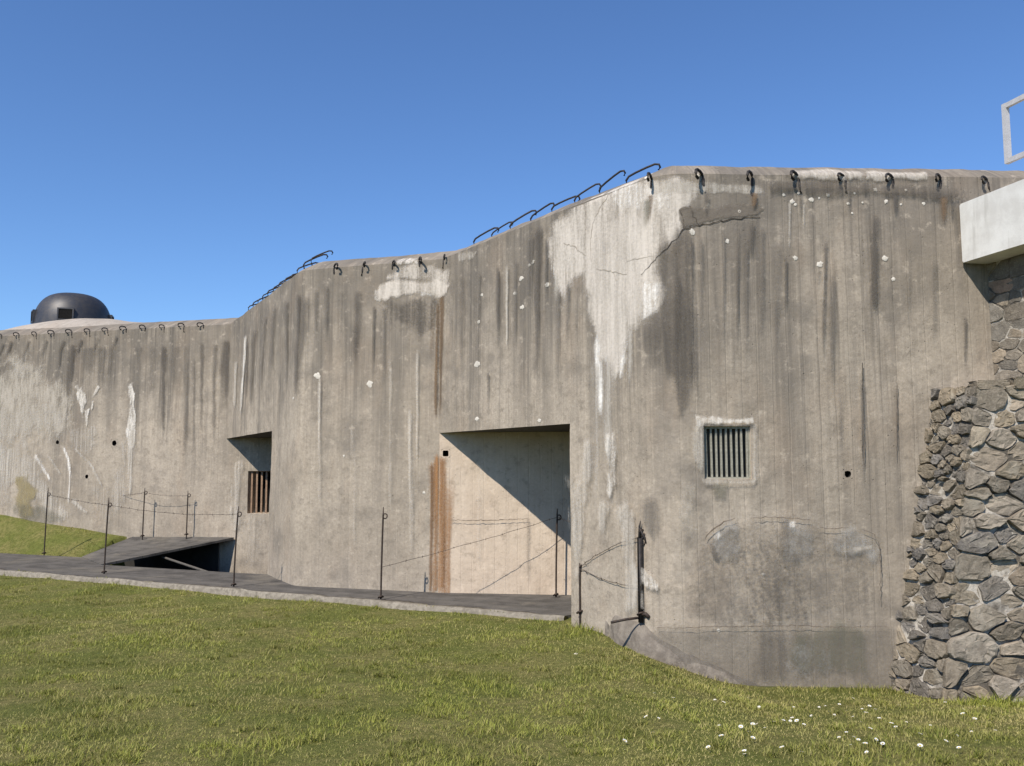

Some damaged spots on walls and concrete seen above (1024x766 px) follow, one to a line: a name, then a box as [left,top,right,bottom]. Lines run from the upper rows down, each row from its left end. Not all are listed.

crack [564,194,760,280]
leakage [771,170,962,218]
leakage [871,216,879,303]
flaking render [545,173,761,460]
leakage [0,444,101,518]
leakage [117,384,136,495]
rust [429,457,451,592]